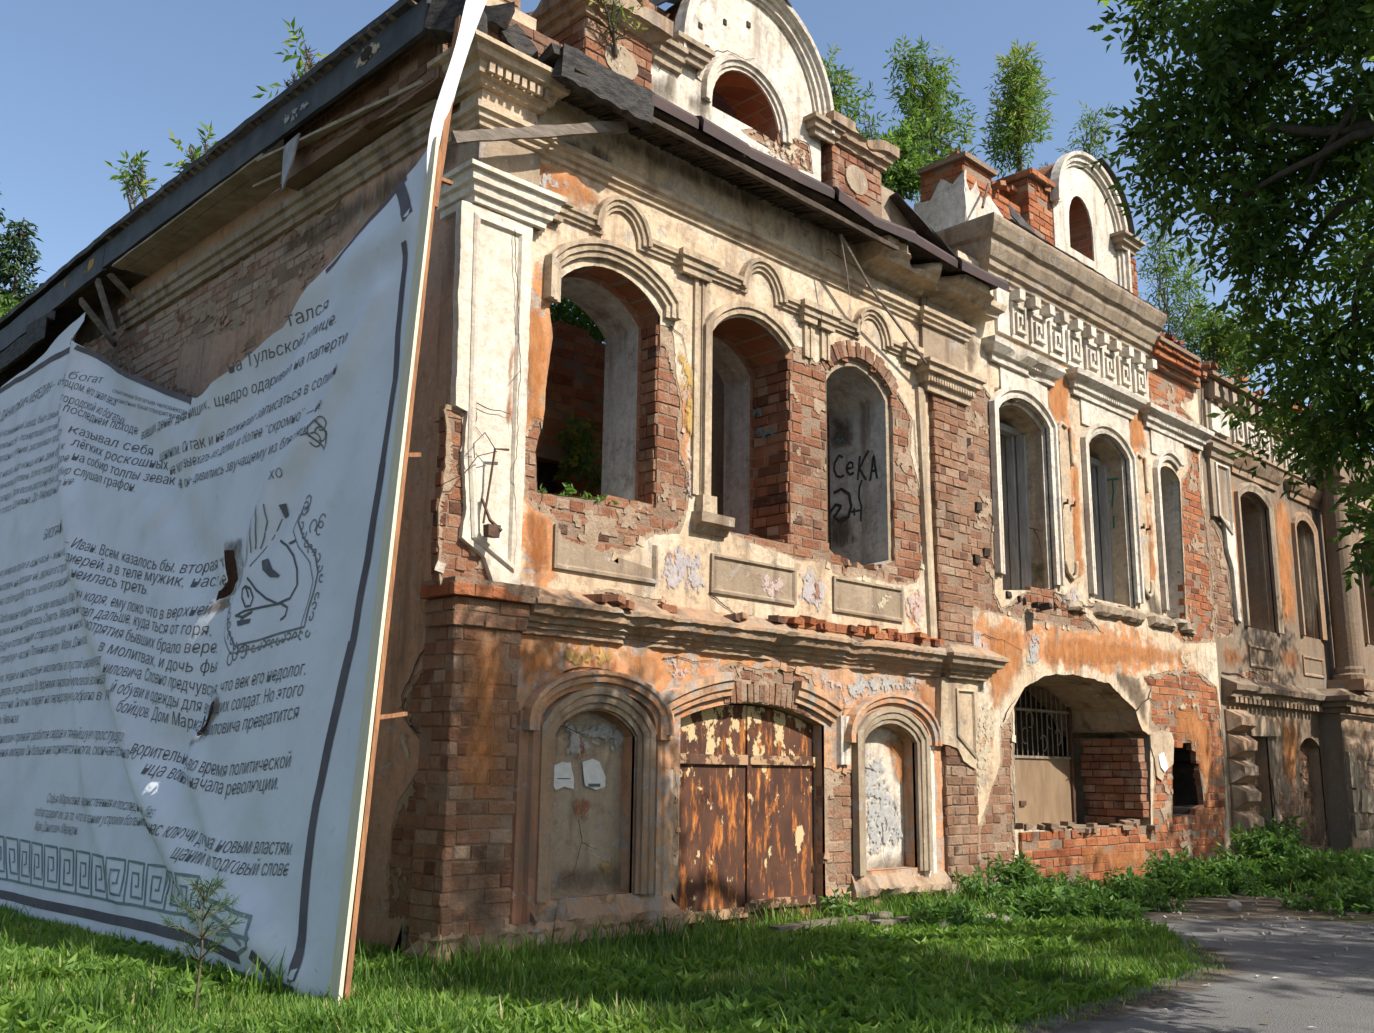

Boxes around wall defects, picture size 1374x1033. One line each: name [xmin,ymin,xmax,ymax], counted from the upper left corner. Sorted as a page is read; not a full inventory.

flaking render [524,325,706,613]
peeling [523,645,611,679]
flaking render [718,661,923,702]
flaking render [977,682,1019,883]
flaking render [1143,669,1226,867]